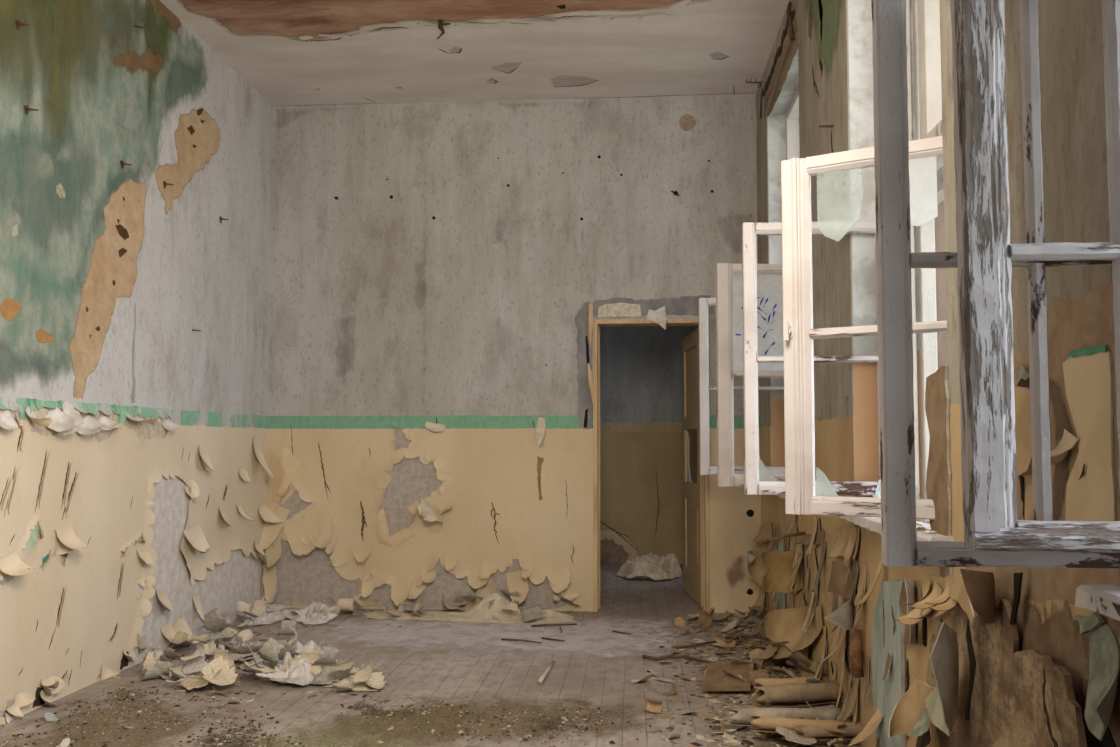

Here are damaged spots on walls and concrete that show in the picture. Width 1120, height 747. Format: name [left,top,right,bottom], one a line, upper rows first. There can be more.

peeling [289,5,566,42]
spalling [550,75,599,87]
leakage [806,0,842,77]
leakage [0,0,682,384]
crack [0,427,81,544]
peeling [0,108,580,681]
peeling [925,366,961,537]
crack [35,550,82,697]
crack [110,625,120,644]
crack [117,563,126,597]
flaking render [747,514,1120,747]